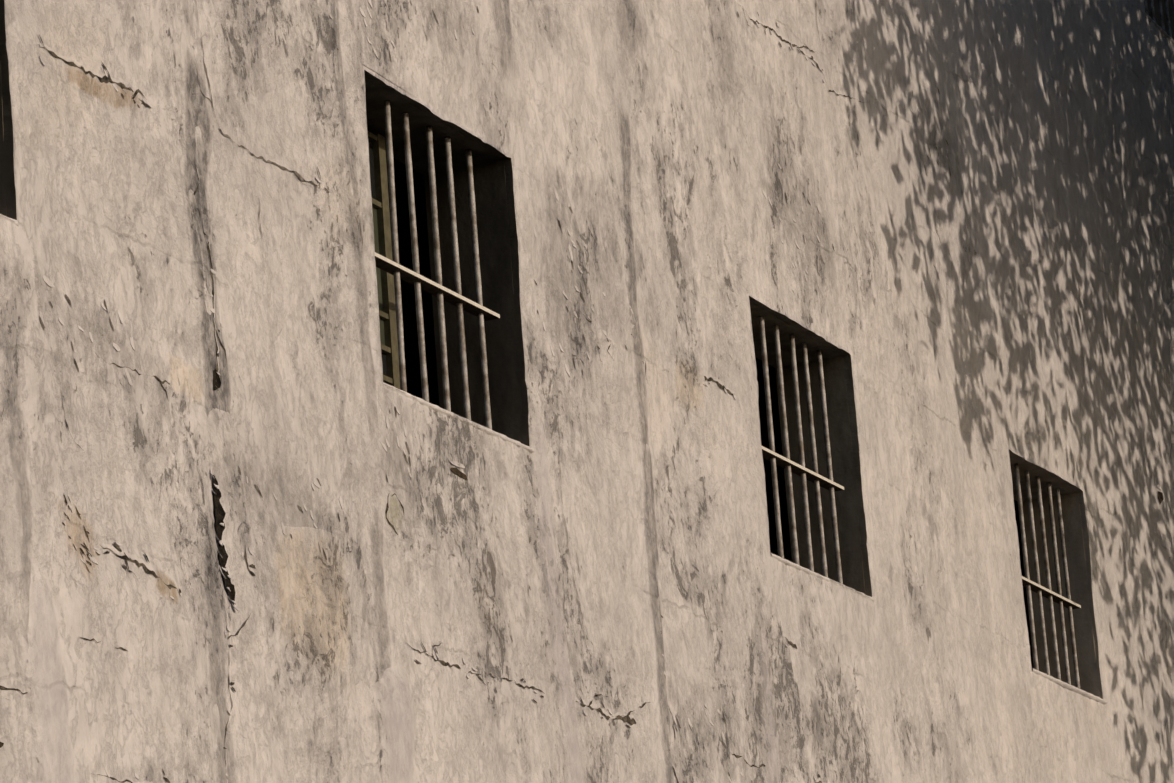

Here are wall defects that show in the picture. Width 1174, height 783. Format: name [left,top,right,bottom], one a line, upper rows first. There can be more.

crack [39,35,151,108]
flaking render [0,184,468,693]
crack [409,642,545,703]
crack [575,615,680,783]